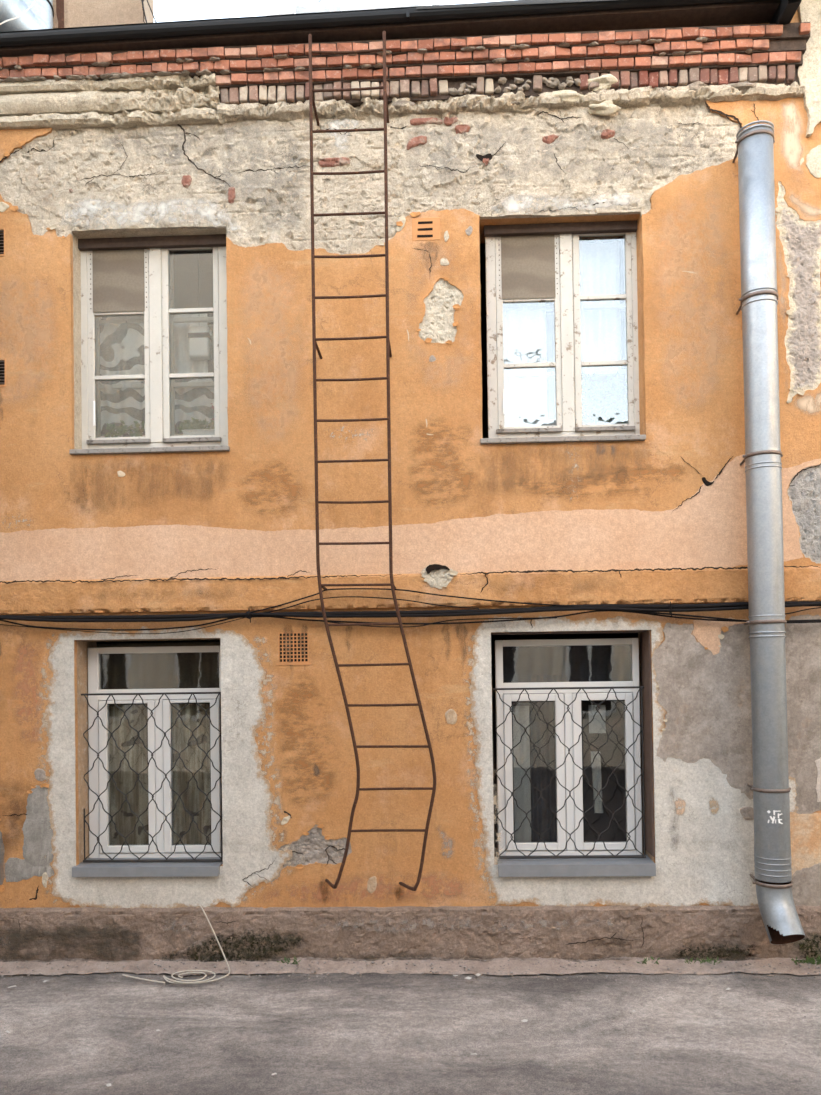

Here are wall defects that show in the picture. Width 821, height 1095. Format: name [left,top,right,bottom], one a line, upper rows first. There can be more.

crack [0,136,56,162]
crack [82,124,310,187]
flaking render [0,103,740,255]
peeling [783,103,804,168]
flaking render [417,258,464,362]
peeling [775,181,821,413]
crack [672,456,733,512]
flaking render [787,464,821,564]
flaking render [421,564,458,589]
peeling [692,617,747,655]
flaking render [271,824,352,882]
peeling [790,812,821,875]